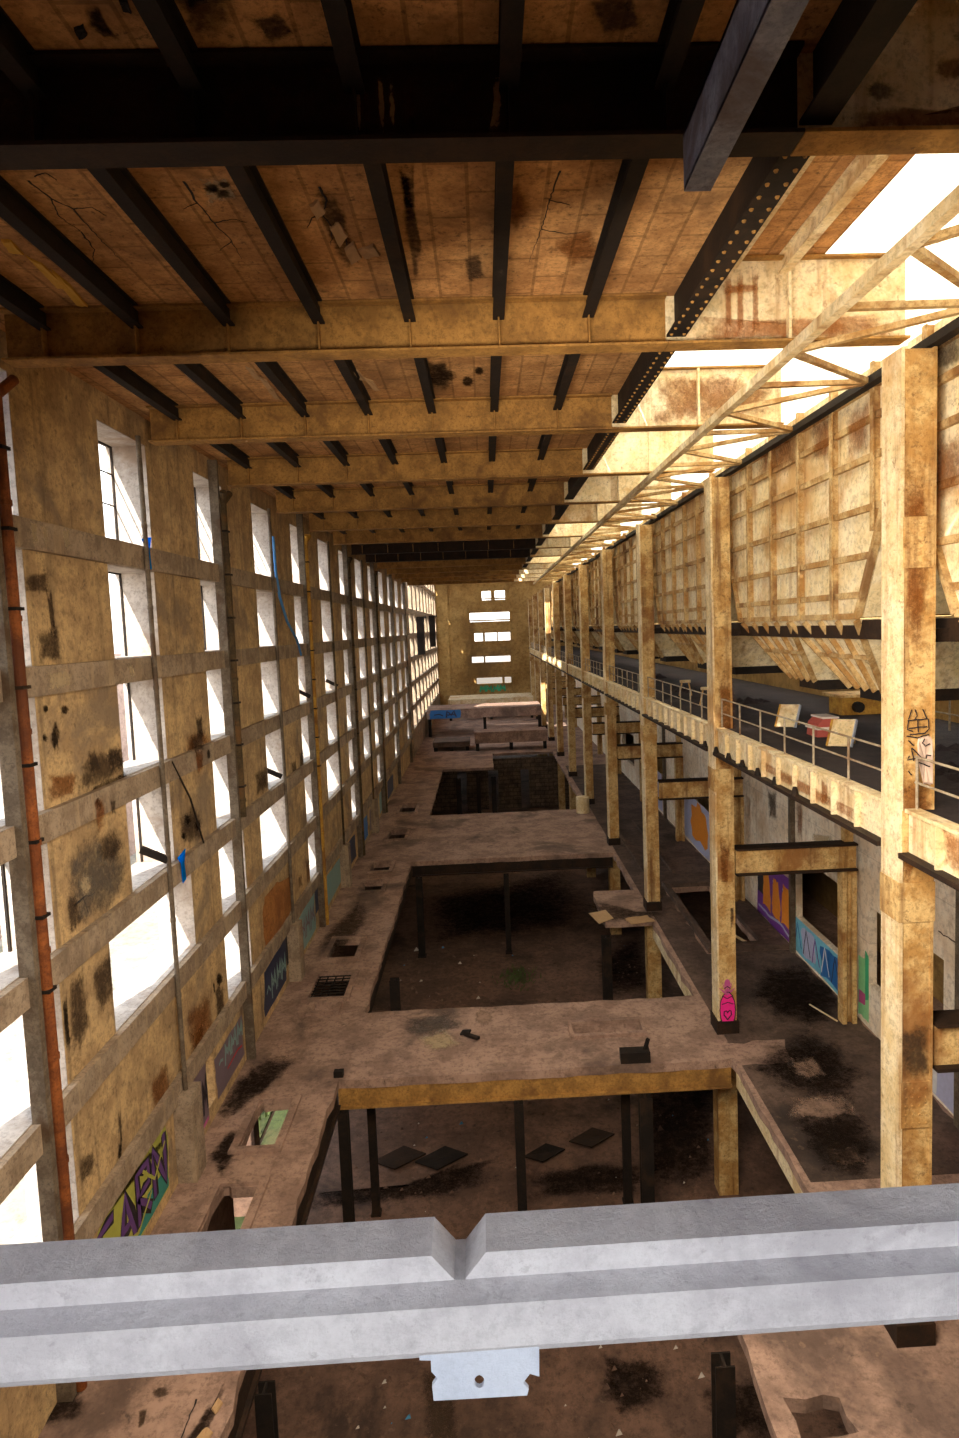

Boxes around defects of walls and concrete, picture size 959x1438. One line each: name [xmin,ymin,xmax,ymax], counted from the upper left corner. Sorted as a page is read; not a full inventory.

damp [255,16,291,41]
damp [593,0,641,32]
crack [27,172,121,262]
spalling [307,187,380,265]
damp [27,574,70,689]
damp [43,706,69,749]
damp [68,834,124,930]